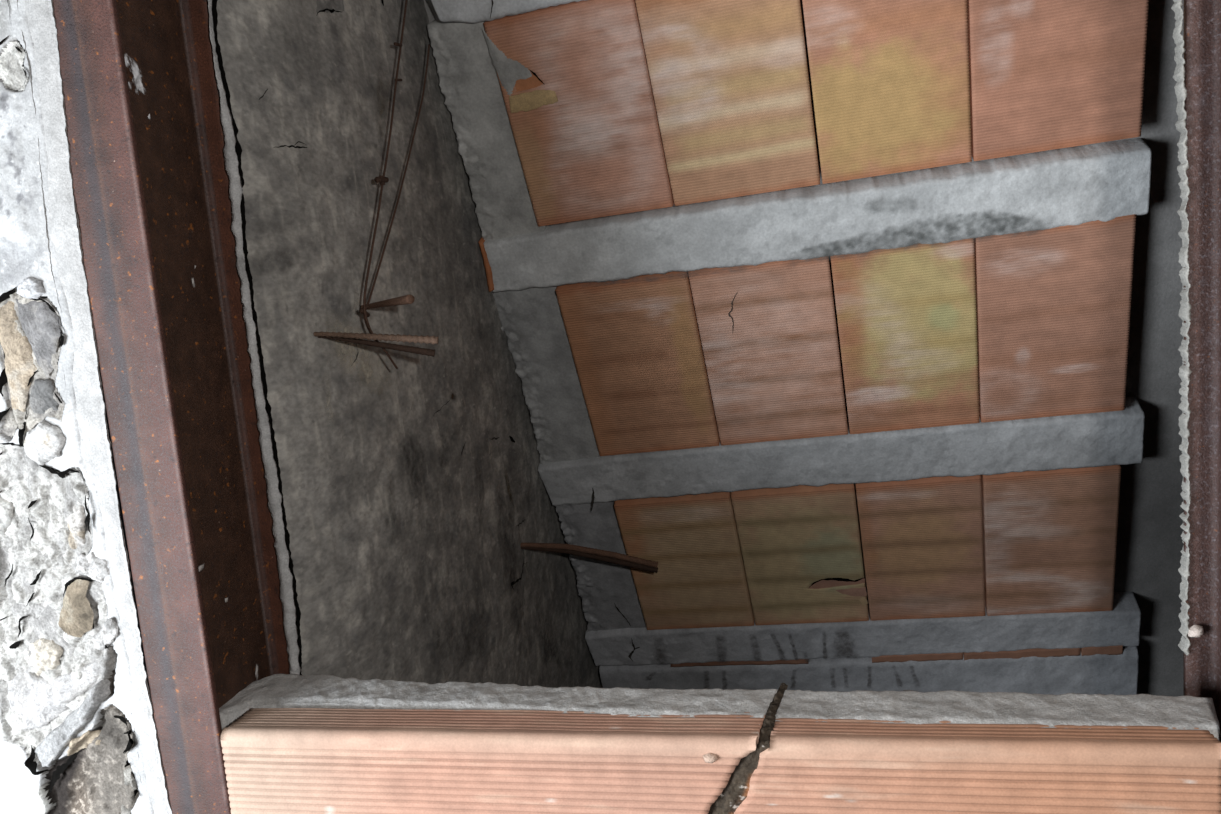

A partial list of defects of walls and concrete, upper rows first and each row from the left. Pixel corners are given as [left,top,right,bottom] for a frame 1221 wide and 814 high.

spalling [515,70,545,92]
water stain [891,214,1024,247]
spalling [0,277,139,814]
spalling [809,577,868,606]
crack [708,683,788,814]